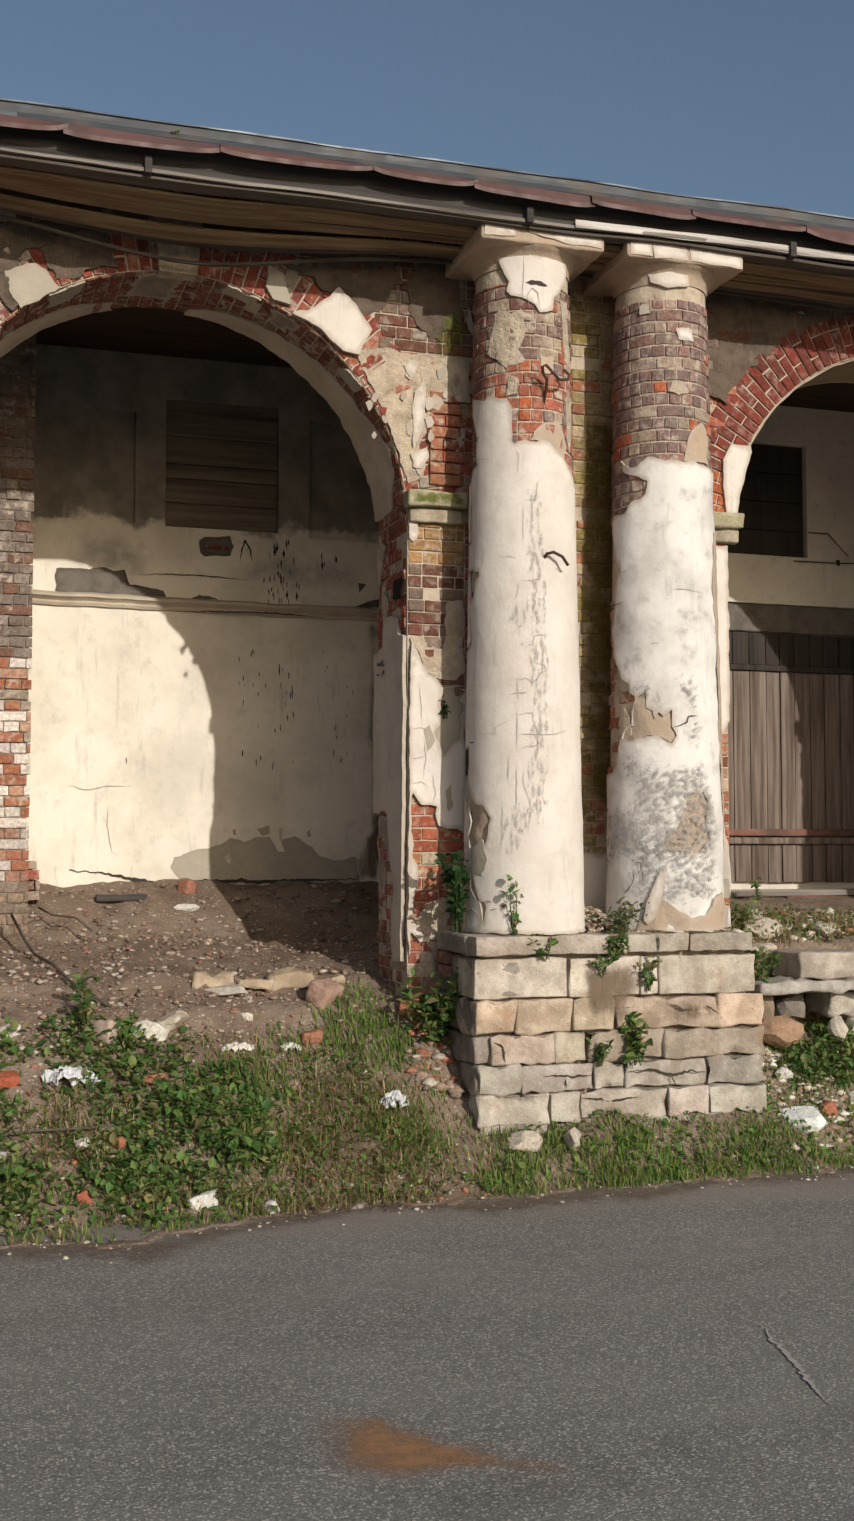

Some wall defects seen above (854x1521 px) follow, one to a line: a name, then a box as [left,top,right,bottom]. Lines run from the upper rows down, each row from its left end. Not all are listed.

peeling [0,188,149,312]
spalling [484,224,602,249]
spalling [202,223,574,487]
spalling [611,242,854,524]
spalling [55,567,166,597]
spalling [608,601,676,774]
peeling [171,518,491,999]
crack [545,1068,707,1102]
crack [760,1324,831,1404]